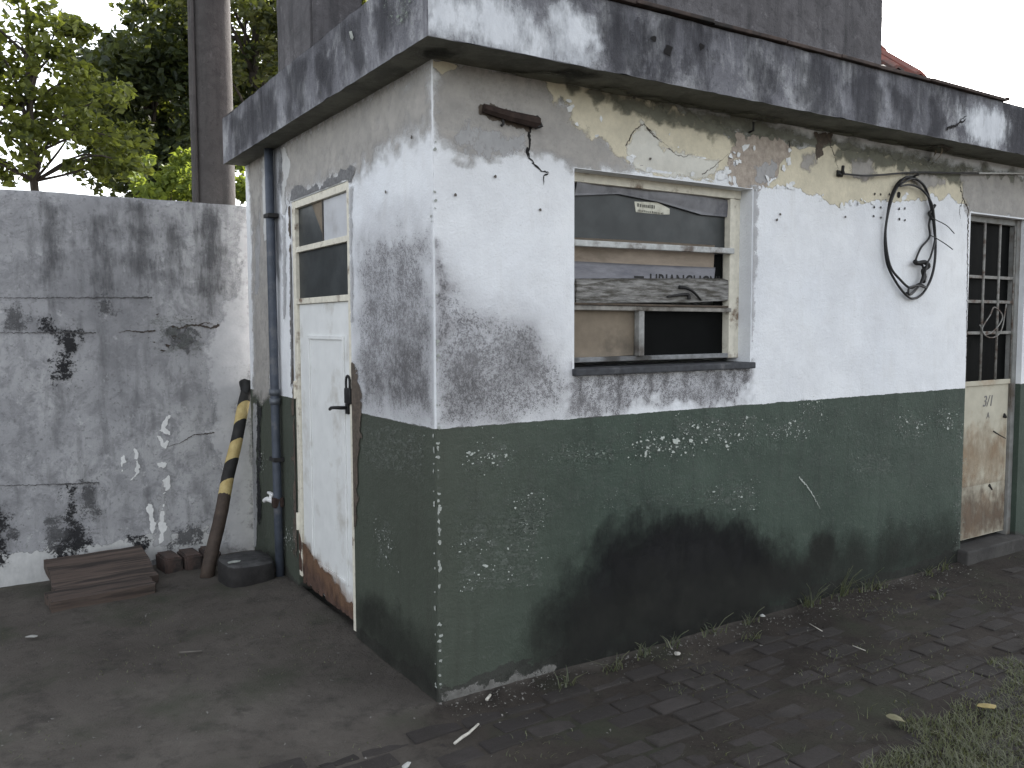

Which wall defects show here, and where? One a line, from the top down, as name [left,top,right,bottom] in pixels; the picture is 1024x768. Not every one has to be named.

crack [526,127,549,182]
peeling [547,82,968,210]
water stain [599,88,1024,218]
water stain [248,0,673,403]
water stain [194,204,222,297]
water stain [3,307,85,389]
crack [123,322,220,340]
water stain [353,215,753,427]
peeling [43,479,102,558]
peeling [126,534,154,550]
rust [302,542,354,620]
rust [961,443,1005,539]